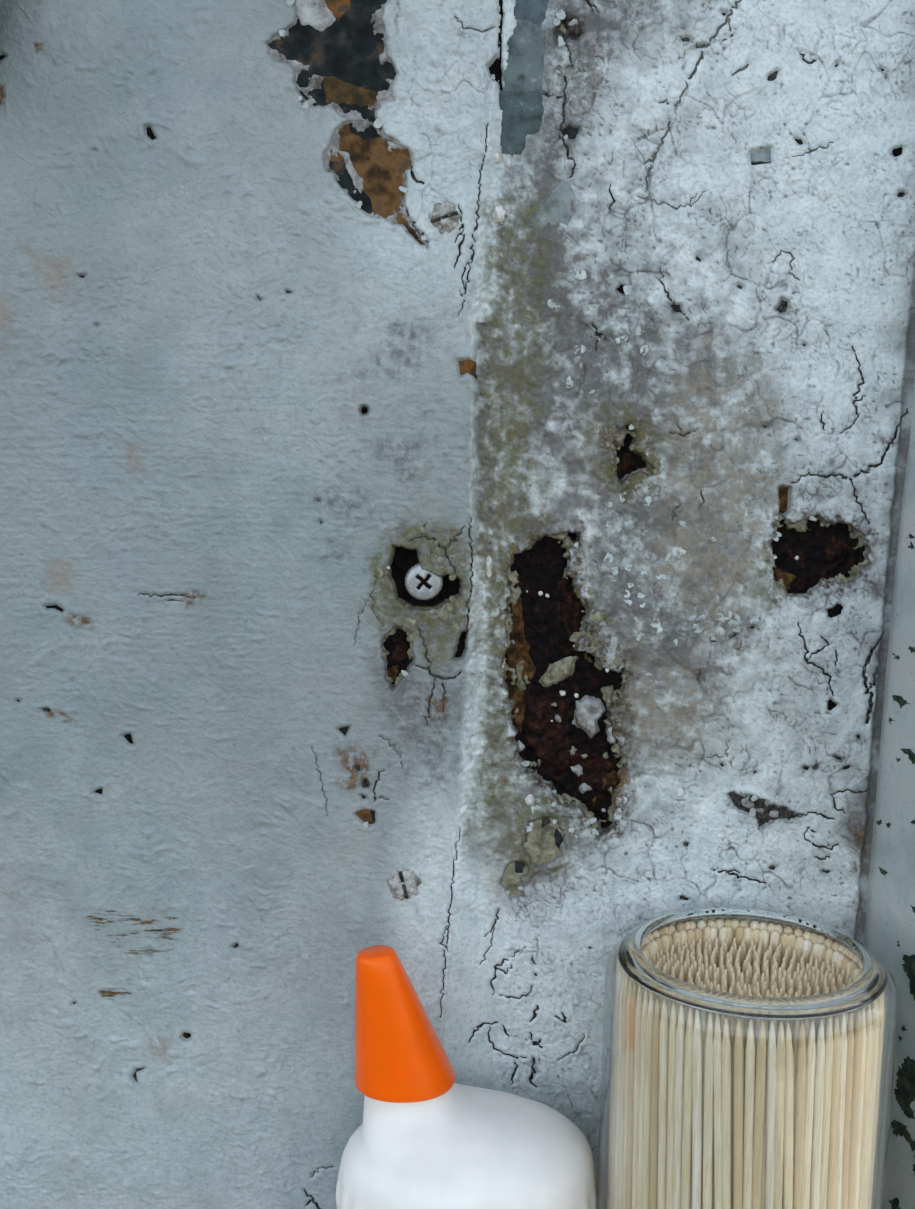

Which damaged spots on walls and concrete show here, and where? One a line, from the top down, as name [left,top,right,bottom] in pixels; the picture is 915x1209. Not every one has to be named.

peeling [268,0,428,248]
crack [454,0,503,90]
peeling [489,0,613,156]
crack [406,124,488,316]
crack [791,408,908,524]
rust [763,511,873,604]
rust [501,532,635,837]
crack [797,622,884,724]
peeling [728,792,802,827]
crack [468,909,585,1088]
spalling [901,954,915,1001]
spalling [891,1056,915,1175]